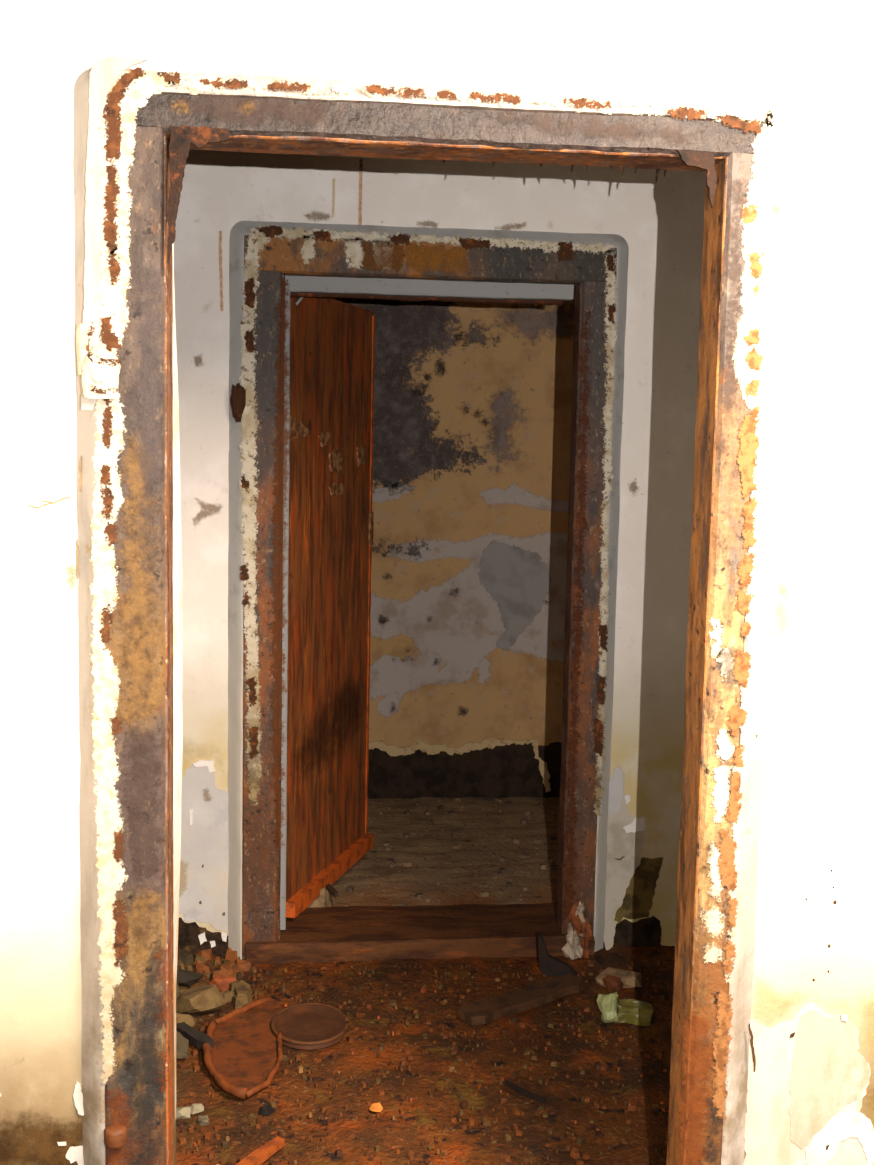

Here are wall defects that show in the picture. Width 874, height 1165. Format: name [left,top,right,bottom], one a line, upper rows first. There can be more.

rust [101,66,182,285]
rust [365,84,523,105]
rust [85,316,122,366]
rust [89,384,120,449]
mould [332,298,575,493]
peeling [479,482,569,513]
rust [732,327,763,688]
peeling [369,531,568,717]
peeling [178,760,229,957]
rust [697,705,748,1121]
peeling [57,1142,84,1165]
spalling [743,1002,874,1165]